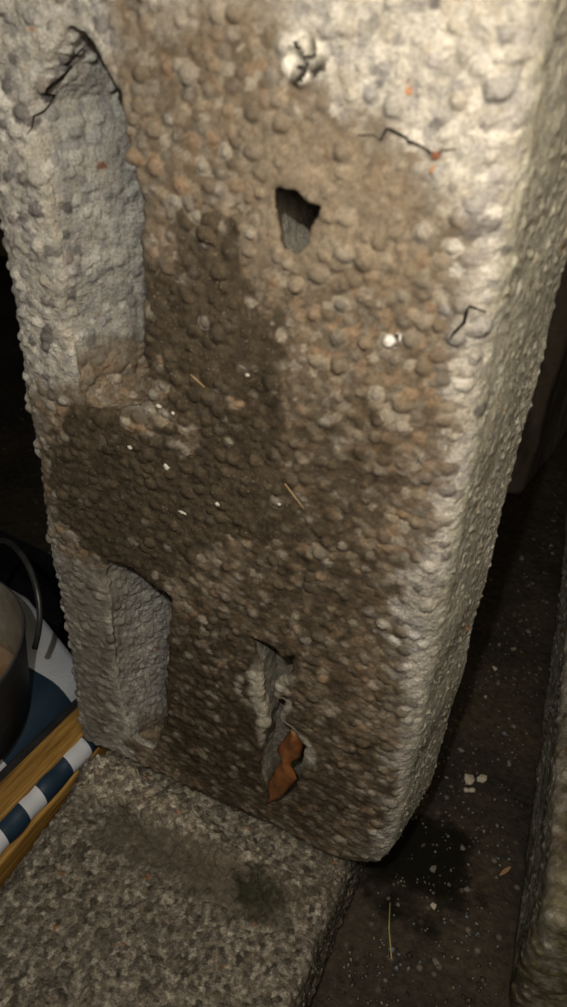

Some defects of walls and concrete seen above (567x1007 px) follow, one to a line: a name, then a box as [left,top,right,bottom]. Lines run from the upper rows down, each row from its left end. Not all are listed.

crack [27,44,121,135]
water stain [282,30,329,83]
crack [357,128,455,154]
spalling [27,25,147,402]
spalling [275,187,321,255]
water stain [385,333,402,348]
crack [449,305,486,340]
spalling [105,562,172,749]
spalling [247,638,316,802]